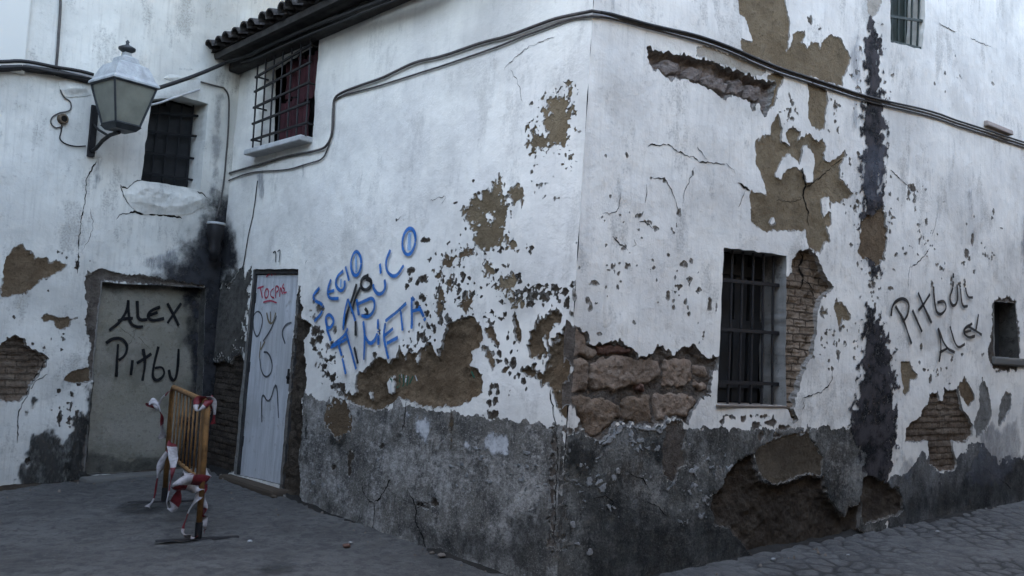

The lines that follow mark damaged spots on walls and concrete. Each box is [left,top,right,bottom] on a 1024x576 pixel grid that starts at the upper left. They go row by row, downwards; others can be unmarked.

damp [18,368,95,484]
crack [77,163,96,273]
spalling [0,243,204,428]
spalling [279,0,1012,553]
crack [605,143,750,249]
damp [854,15,890,230]
damp [861,257,883,289]
damp [848,296,901,483]